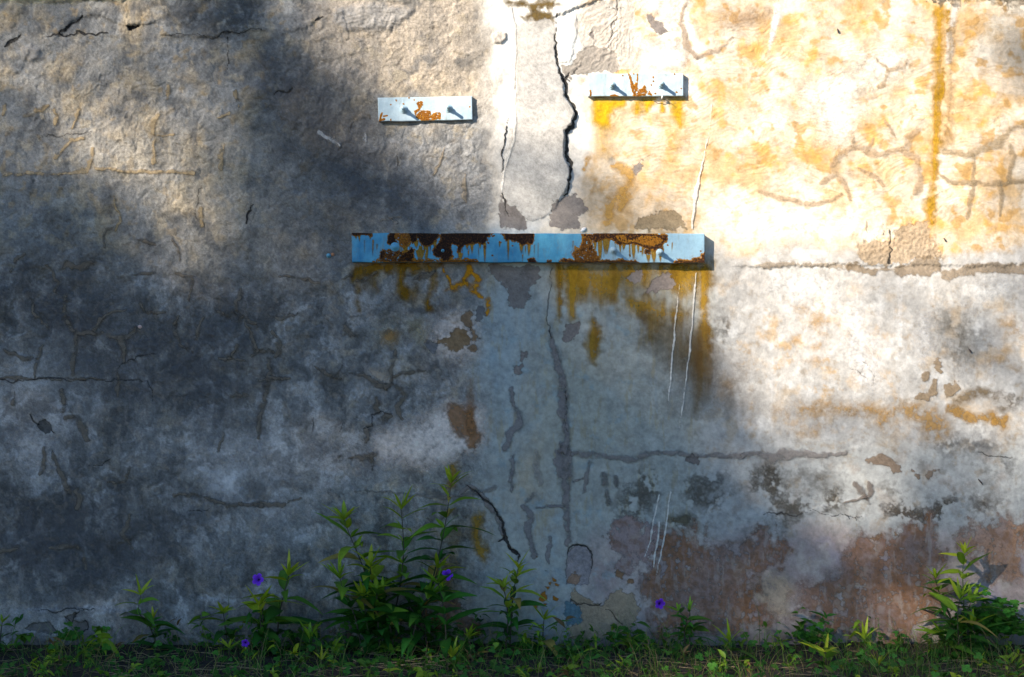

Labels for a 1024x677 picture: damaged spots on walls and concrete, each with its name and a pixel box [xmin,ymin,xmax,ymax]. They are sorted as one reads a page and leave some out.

crack [47,15,108,37]
rust [379,97,441,121]
crack [554,13,578,196]
rust [589,73,682,126]
crack [501,118,509,214]
rust [352,163,711,348]
rust [588,319,601,361]
damp [680,273,697,418]
crack [315,269,846,569]
damp [633,476,691,575]
damp [884,497,956,523]
peeling [563,515,793,643]